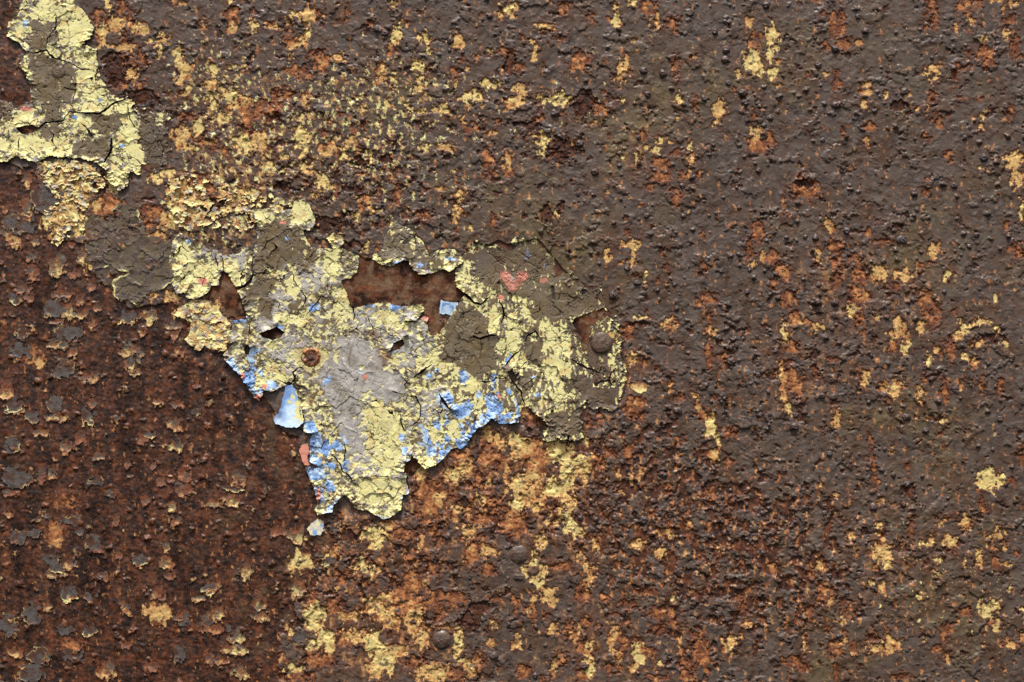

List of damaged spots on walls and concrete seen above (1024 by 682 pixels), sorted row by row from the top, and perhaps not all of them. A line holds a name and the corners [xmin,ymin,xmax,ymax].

crack [18,15,137,163]
corrosion [194,49,349,160]
crack [177,242,307,312]
peeling [0,0,680,682]
crack [371,364,432,431]
crack [466,278,541,403]
crack [561,358,616,386]
corrosion [741,221,819,430]
corrosion [803,226,907,338]
corrosion [37,467,79,548]
corrosion [387,465,509,580]
corrosion [563,578,713,682]